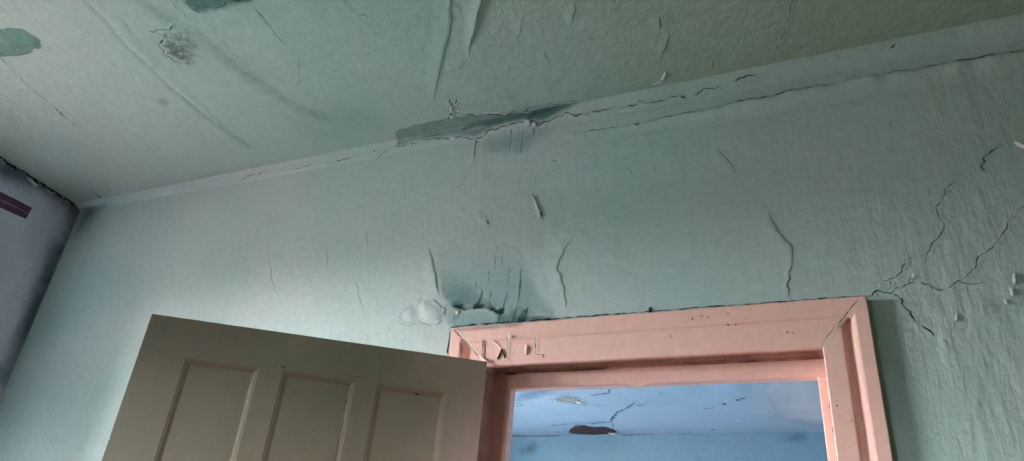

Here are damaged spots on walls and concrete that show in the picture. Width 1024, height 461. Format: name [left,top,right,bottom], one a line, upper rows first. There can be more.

crack [868,51,1013,75]
crack [447,143,1024,359]
peeling [479,332,547,375]
spalling [569,425,617,435]